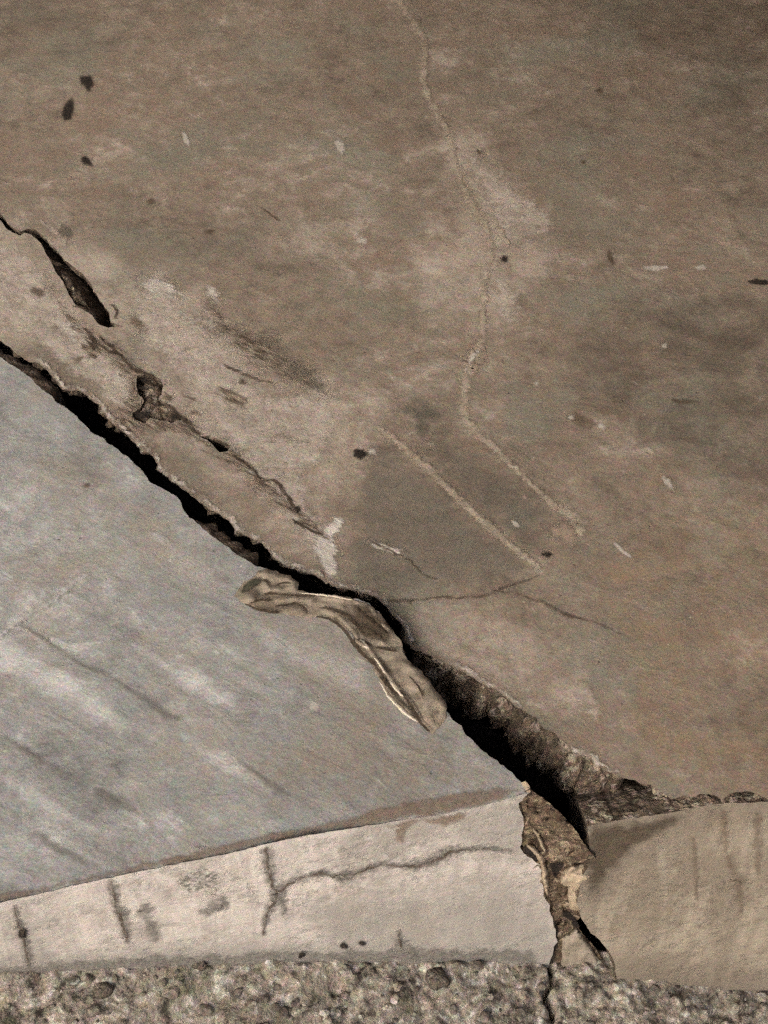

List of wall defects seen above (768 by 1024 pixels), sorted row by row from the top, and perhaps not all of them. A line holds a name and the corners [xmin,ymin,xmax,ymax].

crack [0,213,155,378]
crack [0,341,755,823]
spalling [458,664,521,706]
crack [14,906,33,967]
crack [107,882,130,944]
crack [259,846,511,936]
crack [396,931,418,961]
spalling [519,746,768,978]